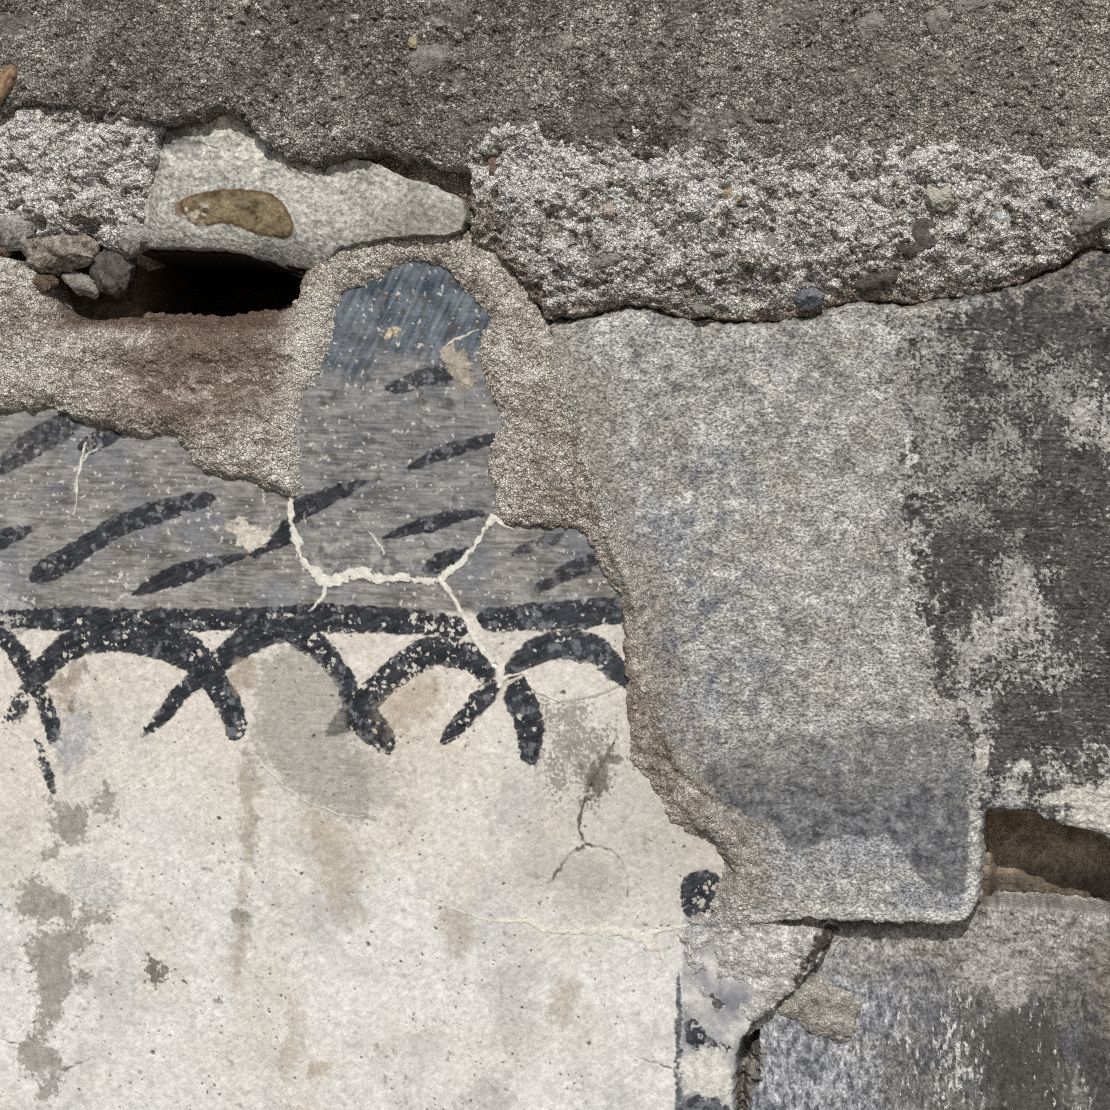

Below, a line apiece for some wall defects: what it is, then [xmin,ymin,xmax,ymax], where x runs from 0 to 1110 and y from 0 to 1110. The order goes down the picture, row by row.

spalling [9,251,26,261]
spalling [58,251,305,320]
spalling [380,326,401,339]
crack [443,329,478,348]
spalling [439,343,477,390]
crack [287,497,620,717]
crack [553,783,608,879]